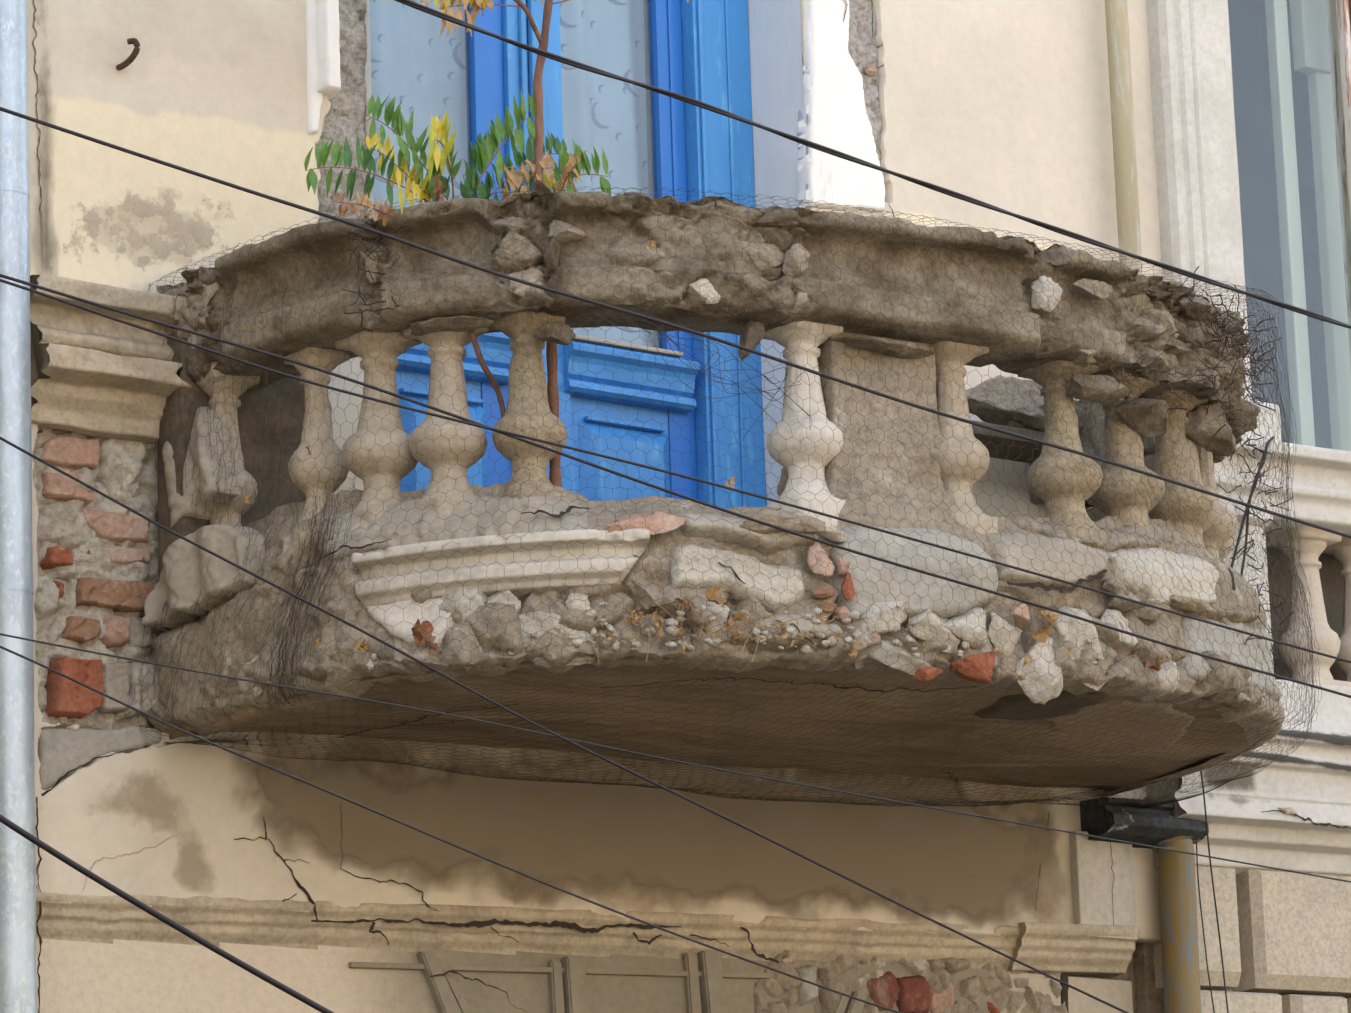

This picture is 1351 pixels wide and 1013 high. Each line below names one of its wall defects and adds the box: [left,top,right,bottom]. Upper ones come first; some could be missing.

spalling [848,0,882,164]
leakage [83,195,214,268]
spalling [508,268,545,298]
spalling [686,278,721,304]
spalling [740,240,810,311]
spalling [1031,275,1113,313]
spalling [965,375,1045,432]
flaking render [33,427,166,790]
spalling [440,510,1213,720]
crack [82,835,173,892]
crack [234,807,779,964]
spalling [753,950,1069,1013]